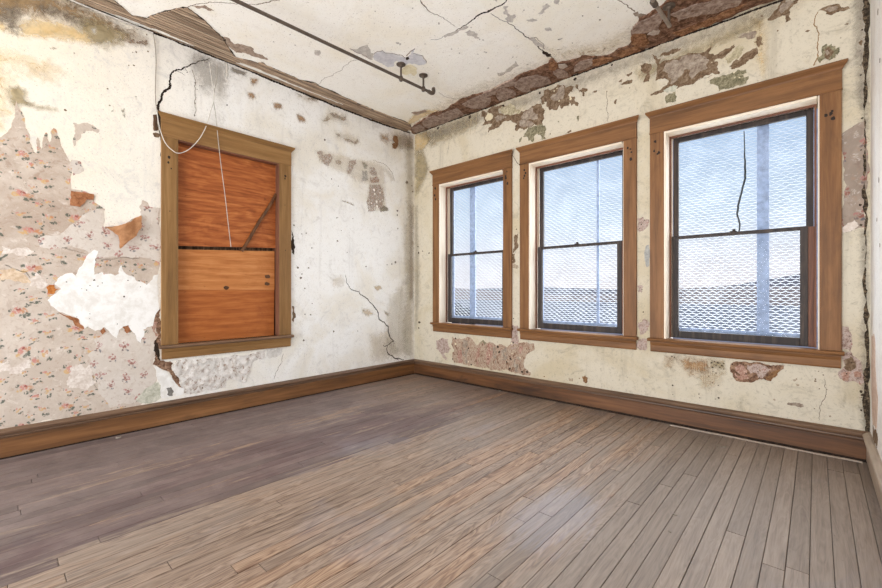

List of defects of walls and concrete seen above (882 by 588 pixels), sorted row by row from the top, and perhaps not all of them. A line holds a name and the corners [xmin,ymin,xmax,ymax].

spalling [153,109,161,141]
crack [157,59,208,117]
peeling [222,36,268,60]
crack [421,0,552,57]
peeling [481,84,607,142]
peeling [618,31,763,103]
peeling [761,0,798,32]
flaking render [317,151,398,216]
flaking render [46,250,184,404]
crack [345,275,404,360]
flaking render [730,361,784,383]
flaking render [838,326,878,447]